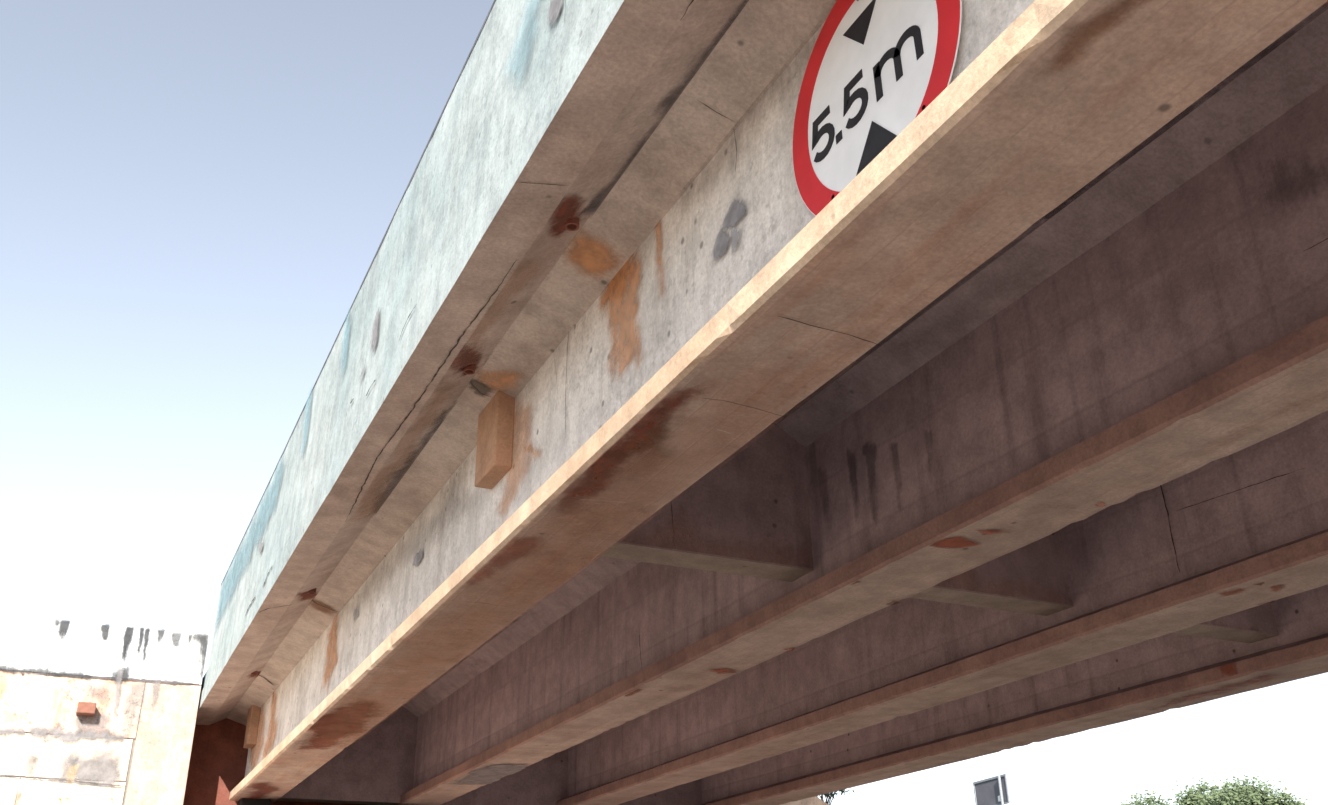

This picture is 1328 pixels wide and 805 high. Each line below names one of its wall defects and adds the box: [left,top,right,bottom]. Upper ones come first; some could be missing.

rust [1056,0,1131,65]
rust [551,197,640,371]
leakage [55,619,70,638]
leakage [0,624,208,787]
rust [299,702,377,750]